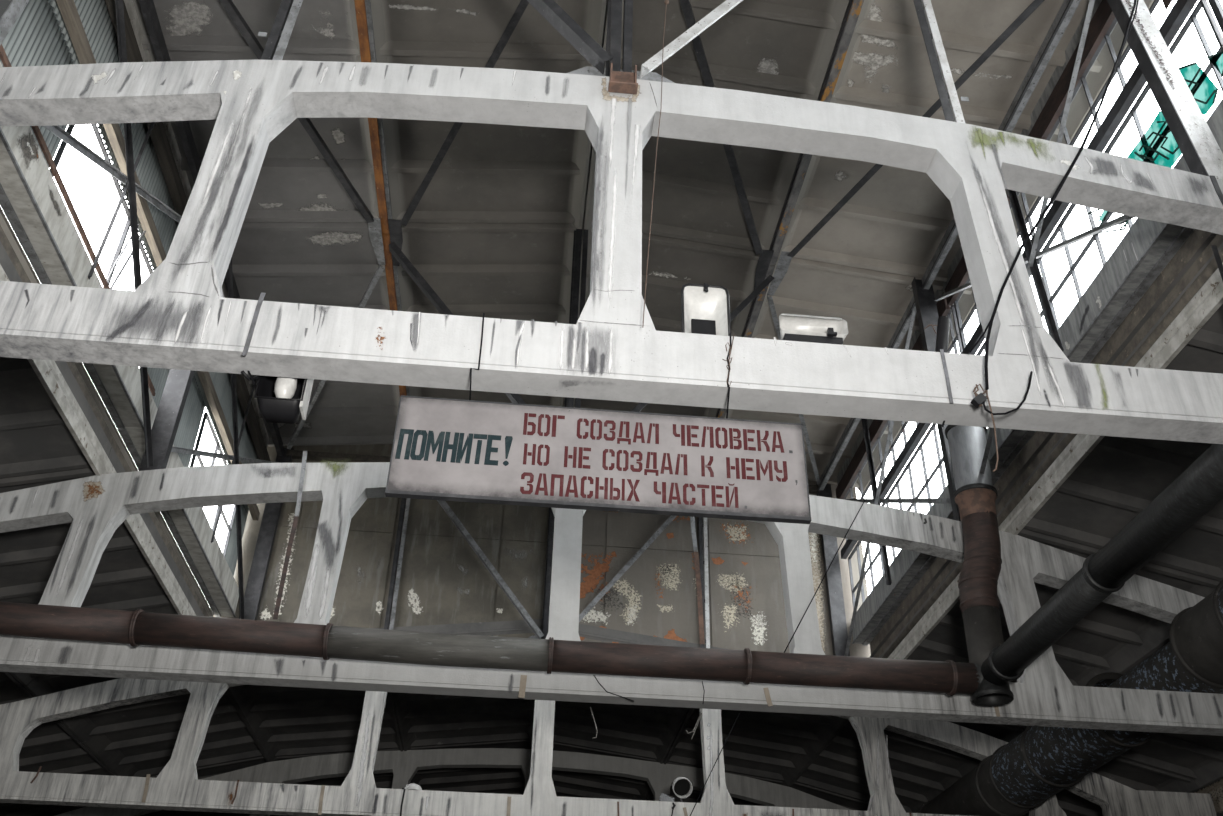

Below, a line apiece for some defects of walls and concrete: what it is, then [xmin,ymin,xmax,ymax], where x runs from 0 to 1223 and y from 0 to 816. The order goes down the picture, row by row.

rust [83,481,105,501]